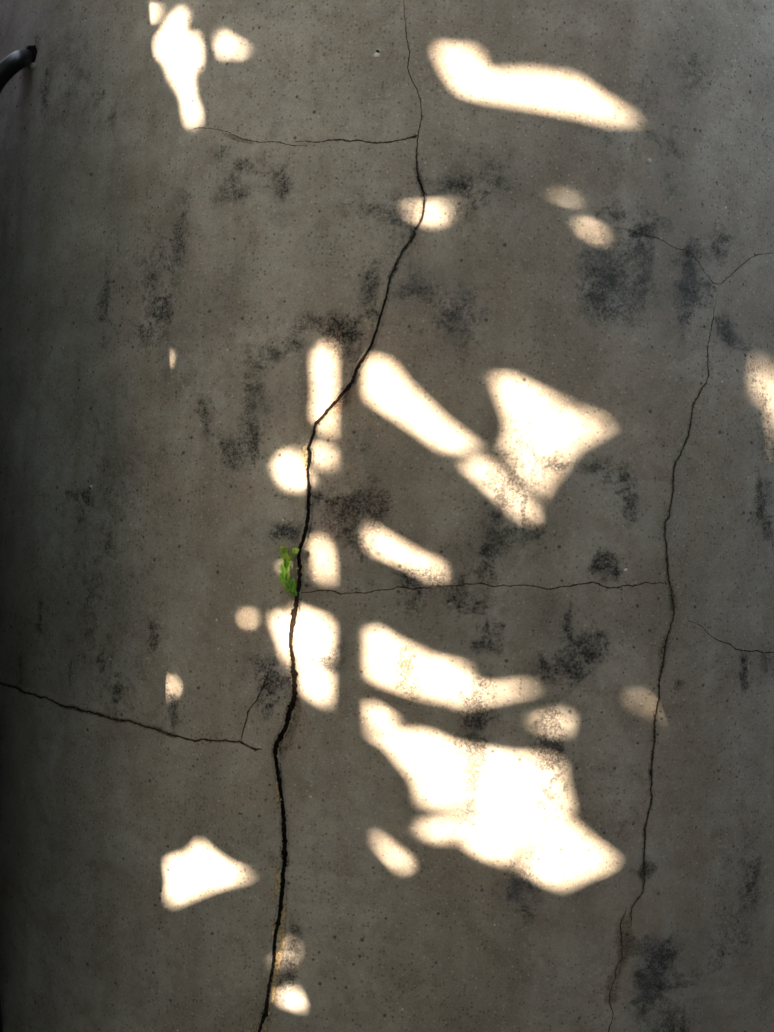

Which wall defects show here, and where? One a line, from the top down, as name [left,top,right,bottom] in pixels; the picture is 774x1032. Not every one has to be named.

crack [192,6,774,1032]
crack [0,672,269,751]
leakage [455,683,496,821]
leakage [534,706,563,809]